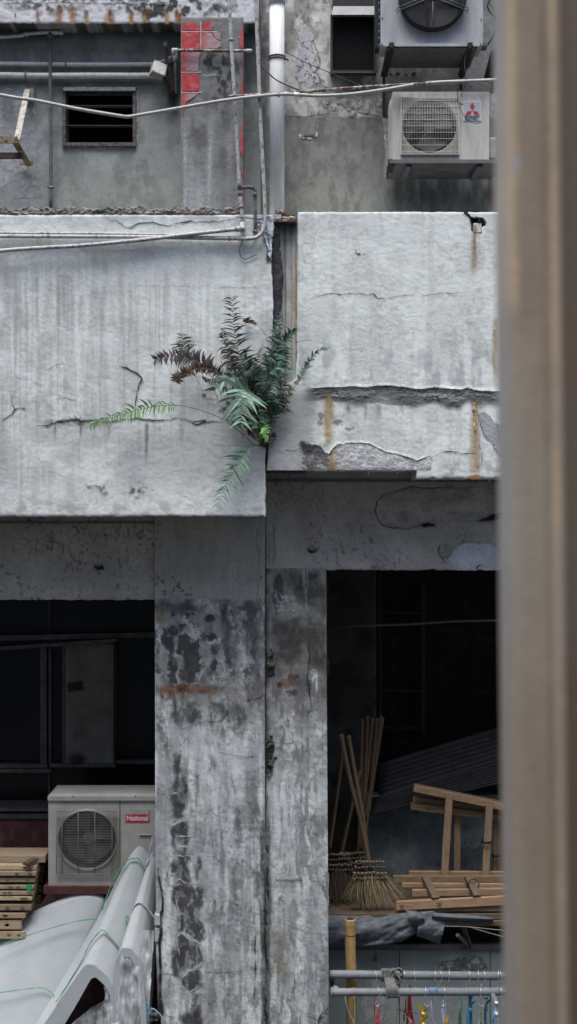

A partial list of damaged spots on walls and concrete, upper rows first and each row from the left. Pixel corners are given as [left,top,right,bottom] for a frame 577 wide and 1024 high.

peeling [285,24,389,152]
crack [1,363,224,427]
corrosion [325,395,333,443]
spalling [299,383,498,470]
corrosion [470,400,481,479]
peeling [438,539,499,571]
leakage [173,700,198,722]
corrosion [160,685,218,696]
leakage [169,755,205,1024]